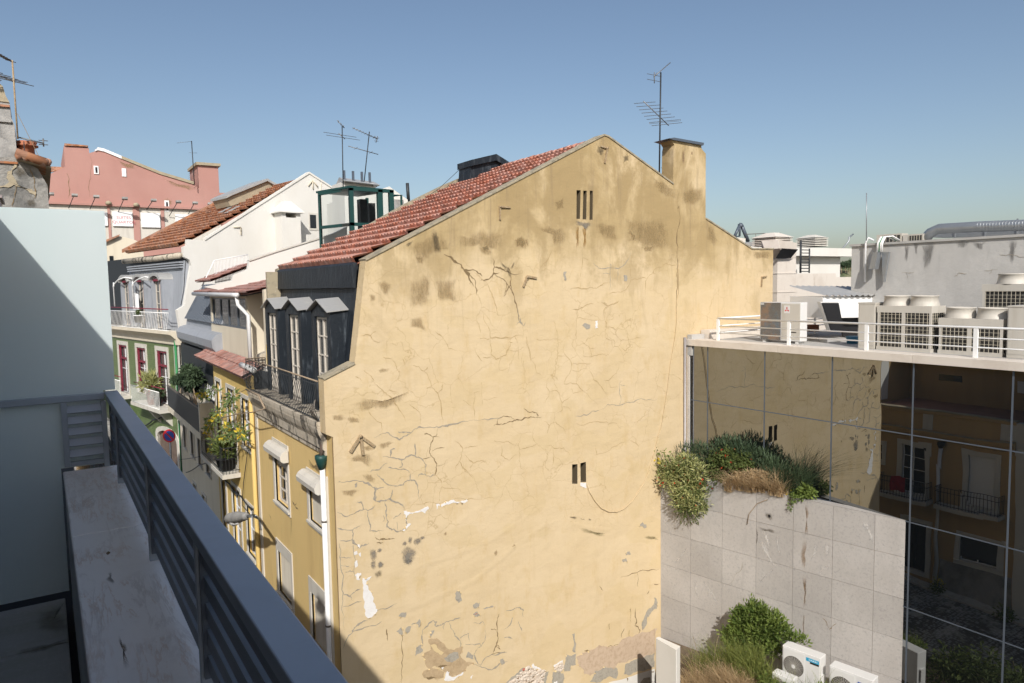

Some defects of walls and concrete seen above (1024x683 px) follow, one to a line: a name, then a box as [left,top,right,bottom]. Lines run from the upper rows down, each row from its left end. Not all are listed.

crack [338,207,680,680]
peeling [402,500,468,532]
peeling [354,544,377,619]
spalling [397,612,474,681]
spalling [506,597,658,683]